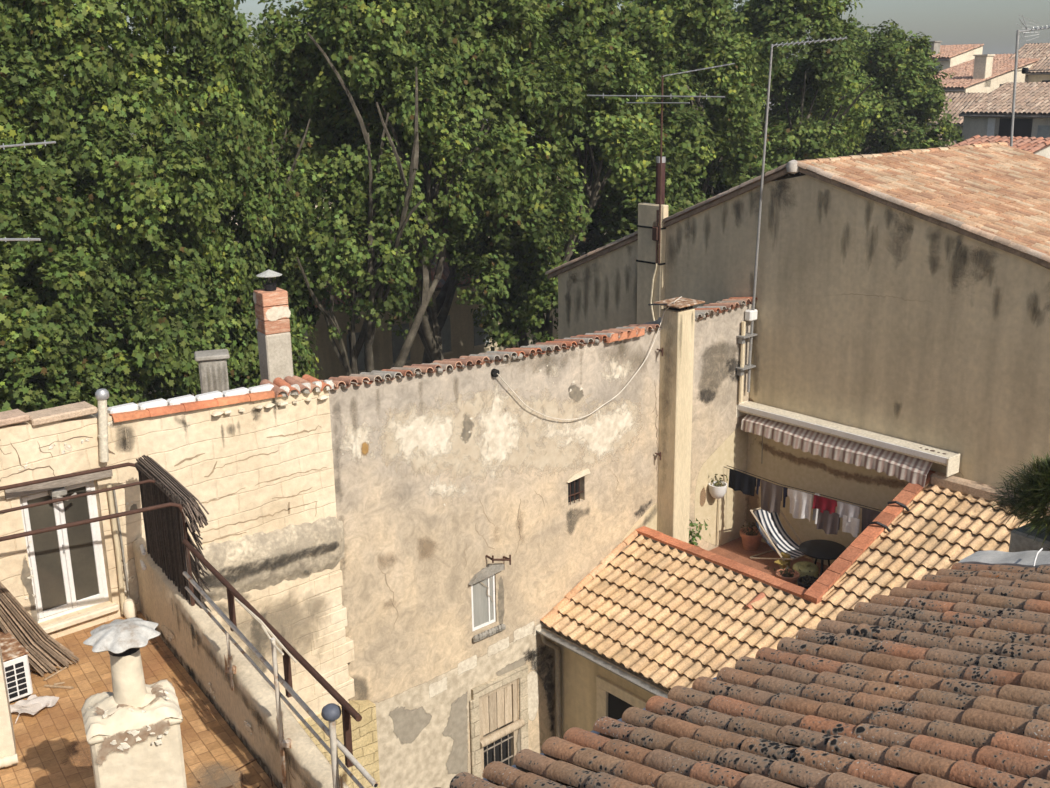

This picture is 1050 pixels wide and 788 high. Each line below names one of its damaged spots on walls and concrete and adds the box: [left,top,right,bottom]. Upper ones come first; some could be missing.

water stain [700,343,740,402]
crack [0,436,115,481]
peeling [340,381,638,506]
water stain [201,541,339,614]
peeling [95,682,170,765]
water stain [524,646,555,731]